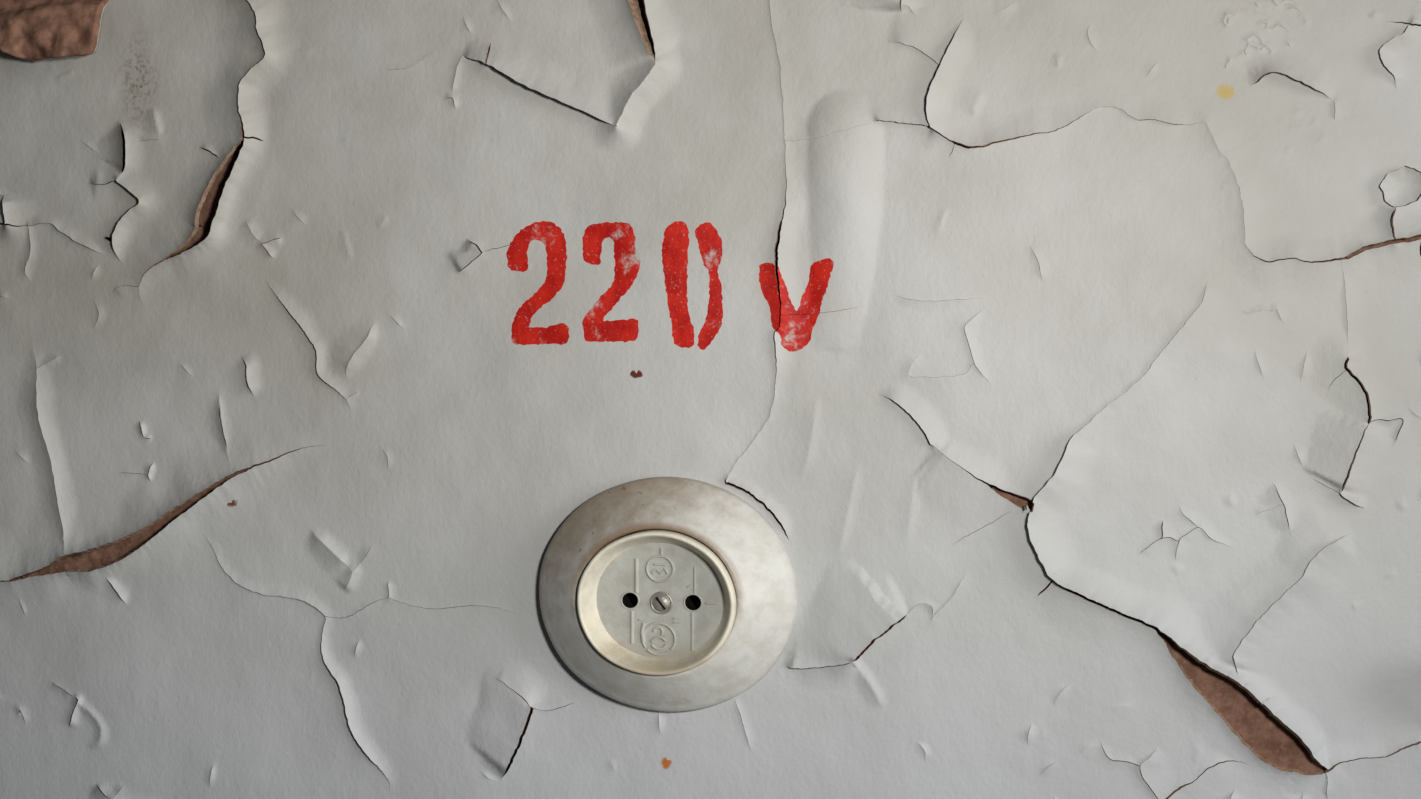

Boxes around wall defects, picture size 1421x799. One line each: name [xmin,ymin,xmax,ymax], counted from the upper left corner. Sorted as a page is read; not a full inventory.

peeling [0,0,109,62]
crack [0,0,287,322]
crack [0,333,524,799]
crack [722,0,1421,799]